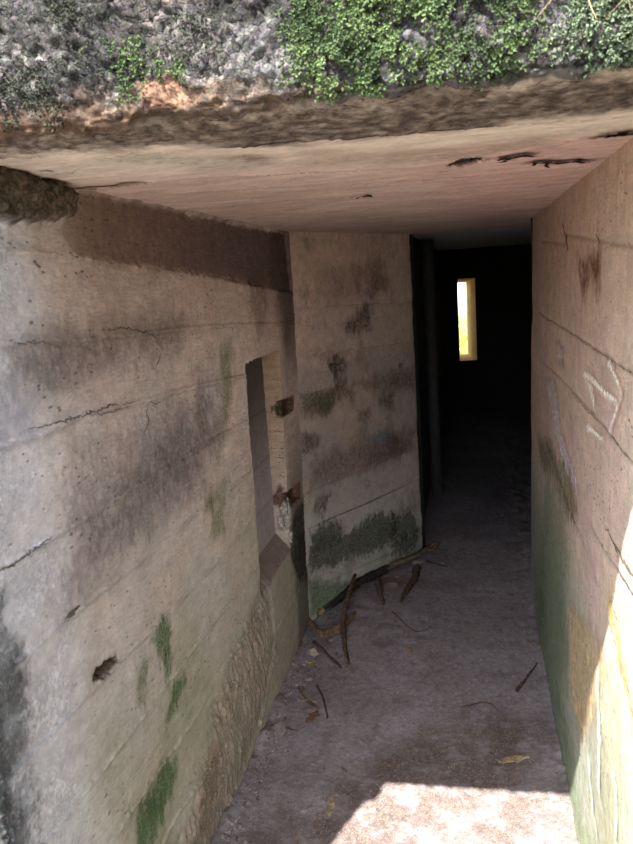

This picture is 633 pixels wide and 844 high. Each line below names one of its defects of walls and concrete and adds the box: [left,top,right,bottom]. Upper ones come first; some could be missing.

spalling [448,157,481,167]
crack [29,401,162,438]
spalling [92,656,117,682]